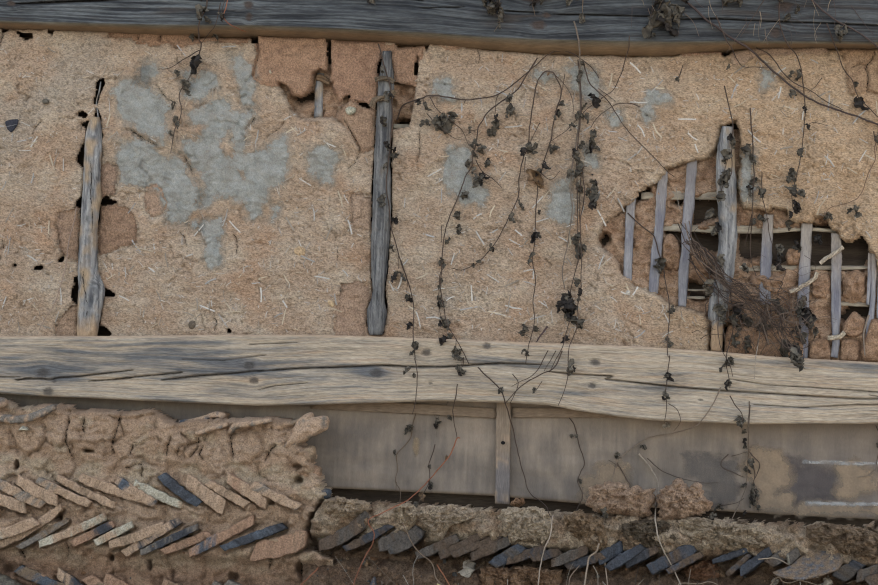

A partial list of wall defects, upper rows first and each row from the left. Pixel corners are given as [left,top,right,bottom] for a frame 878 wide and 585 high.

peeling [97,33,426,270]
spalling [598,131,721,316]
spalling [716,129,878,362]
leakage [781,457,835,506]